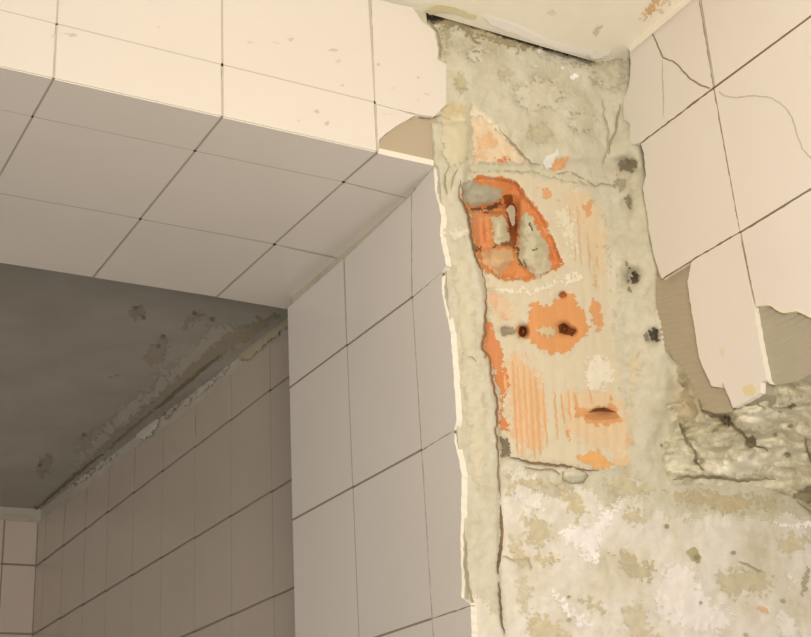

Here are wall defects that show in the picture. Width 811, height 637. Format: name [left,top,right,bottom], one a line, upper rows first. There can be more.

peeling [425,5,628,69]
crack [652,34,811,158]
flaking render [460,149,811,528]
crack [444,166,599,633]
peeling [508,509,573,637]
peeling [607,549,658,583]
peeling [686,547,702,563]
peeling [714,565,775,602]
peeling [775,529,810,560]
peeling [567,594,607,616]
peeling [621,599,664,637]